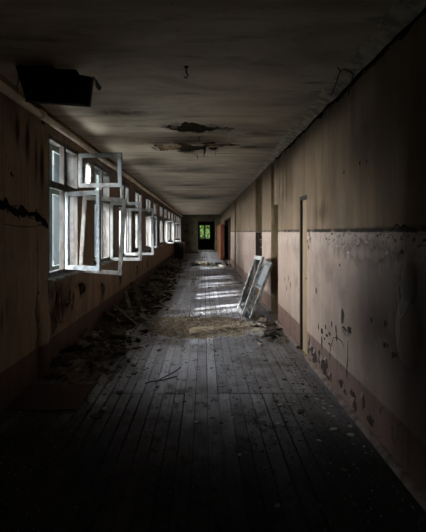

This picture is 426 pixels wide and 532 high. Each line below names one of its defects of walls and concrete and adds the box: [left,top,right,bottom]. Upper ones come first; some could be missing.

spalling [151,122,239,156]
peeling [307,309,365,412]